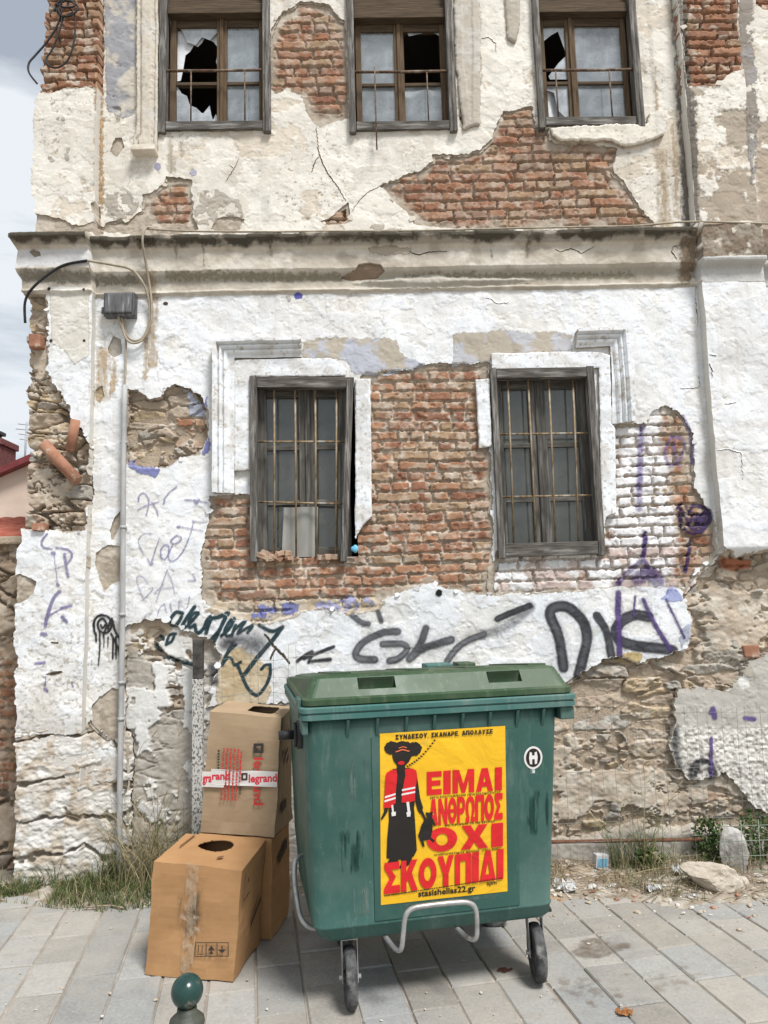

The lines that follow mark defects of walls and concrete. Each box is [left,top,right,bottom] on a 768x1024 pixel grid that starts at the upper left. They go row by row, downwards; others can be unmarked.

flaking render [40,0,137,123]
flaking render [270,2,349,128]
flaking render [673,0,768,183]
flaking render [35,163,244,250]
crack [311,128,384,211]
flaking render [342,244,410,281]
flaking render [370,107,655,231]
flaking render [22,285,95,533]
flaking render [126,384,211,477]
flaking render [201,328,768,871]